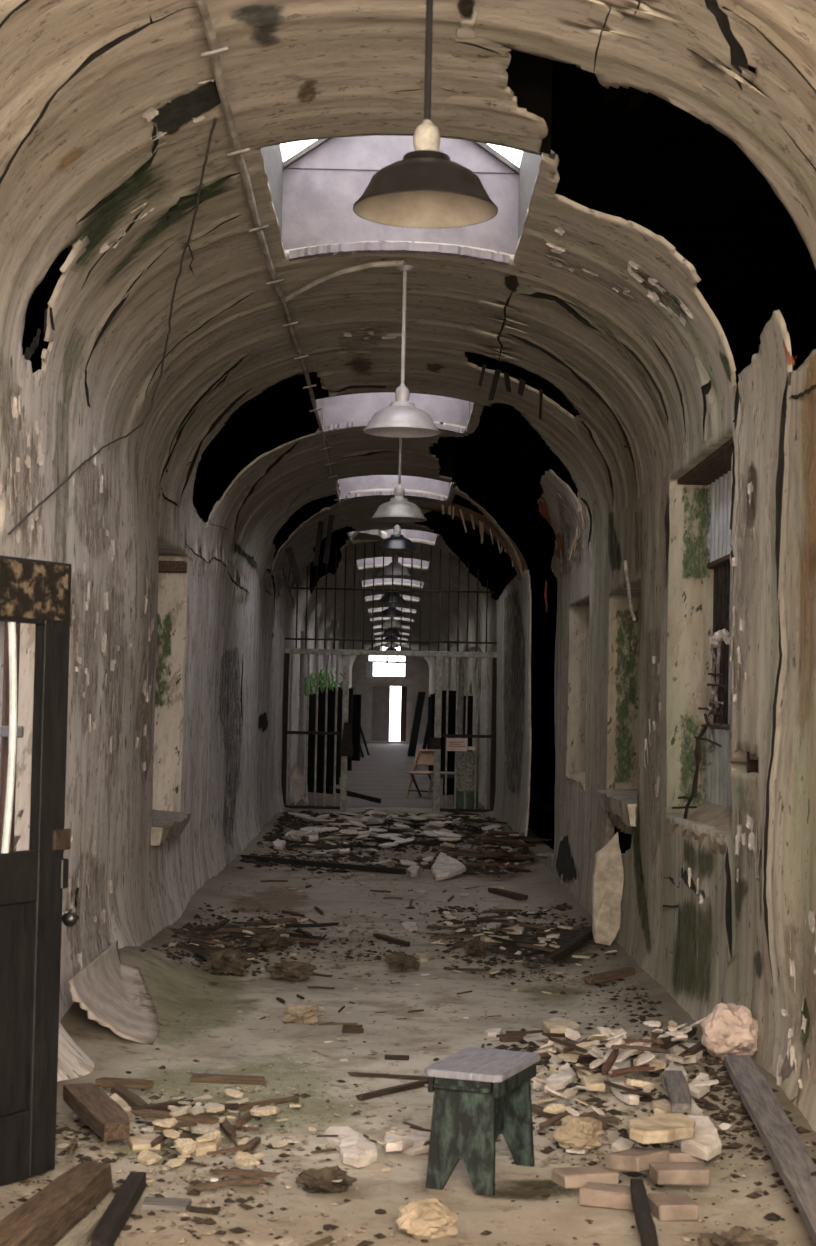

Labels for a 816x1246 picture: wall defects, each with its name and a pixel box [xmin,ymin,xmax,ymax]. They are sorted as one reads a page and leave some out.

crack [0,0,198,228]
crack [552,0,816,209]
peeling [545,227,695,326]
spalling [328,420,370,432]
spalling [434,423,464,435]
crack [473,283,744,600]
peeling [0,362,155,780]
crack [724,374,816,988]
leakage [735,879,747,918]